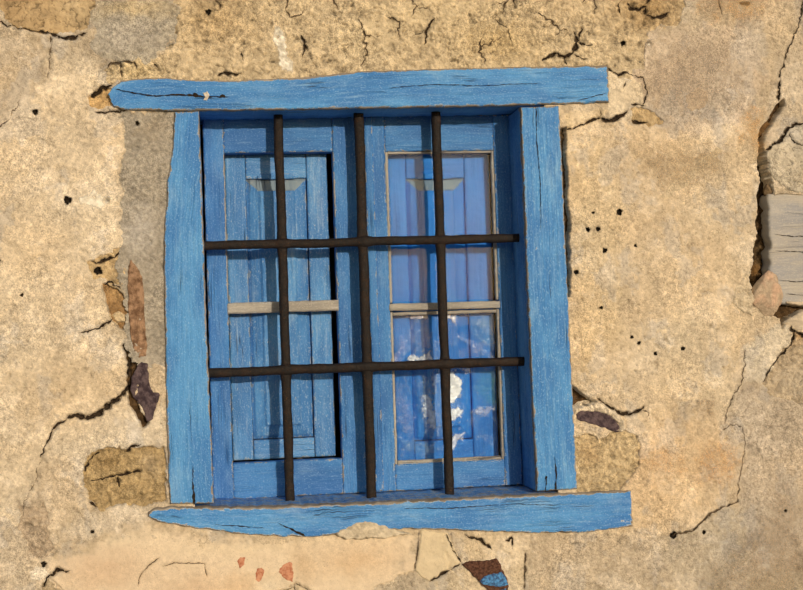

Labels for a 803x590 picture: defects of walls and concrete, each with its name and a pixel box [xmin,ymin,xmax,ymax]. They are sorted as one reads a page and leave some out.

crack [358,0,435,66]
crack [538,0,597,65]
crack [777,2,803,101]
crack [567,68,648,130]
peeling [757,125,803,193]
crack [766,123,803,150]
crack [763,325,803,382]
crack [23,358,132,515]
spalling [83,446,167,512]
spalling [573,398,641,492]
crack [673,350,746,536]
peeling [18,503,461,590]